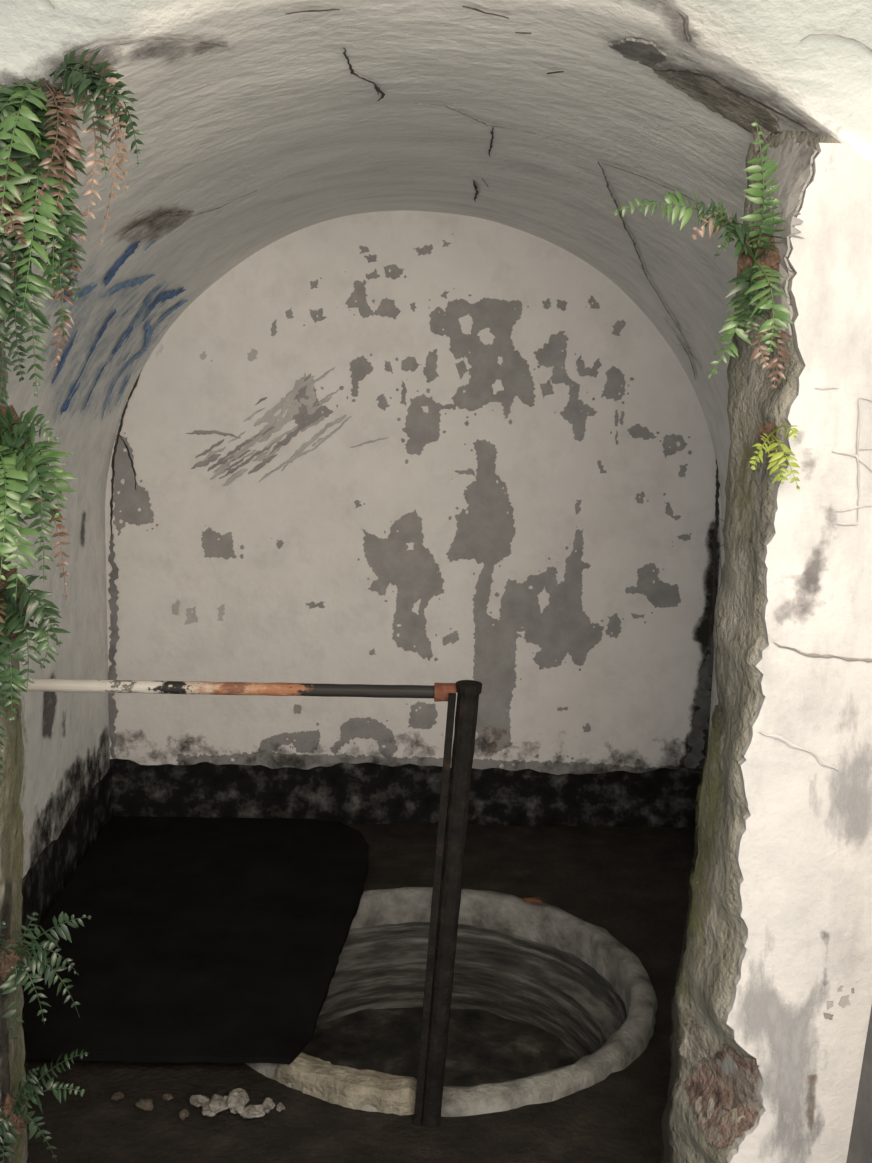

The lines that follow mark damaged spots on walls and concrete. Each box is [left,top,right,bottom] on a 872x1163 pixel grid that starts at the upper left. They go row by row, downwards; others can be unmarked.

crack [343,47,385,101]
crack [414,103,536,202]
peeling [414,233,453,256]
crack [598,161,699,380]
peeling [271,308,327,336]
peeling [292,246,692,477]
peeling [358,439,681,775]
damp [800,549,821,613]
crack [774,642,872,662]
peeling [176,717,452,770]
damp [833,758,869,838]
spalling [679,1017,762,1149]